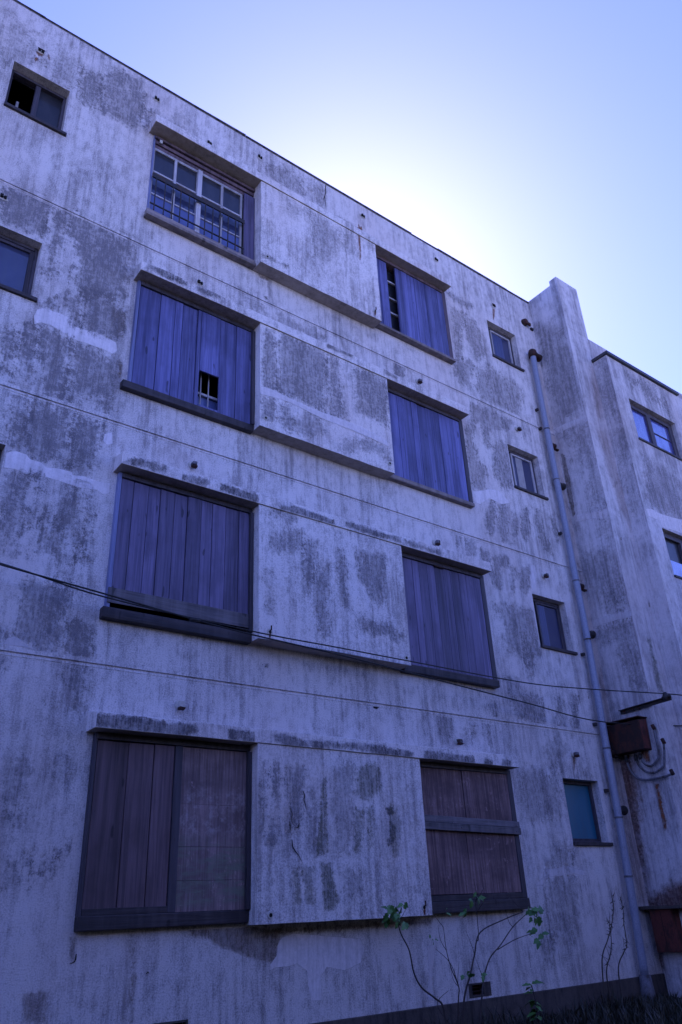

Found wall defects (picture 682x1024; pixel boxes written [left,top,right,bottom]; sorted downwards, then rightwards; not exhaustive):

water stain [79,68,152,128]
water stain [261,329,405,438]
water stain [485,500,558,550]
crack [289,791,306,862]
rust [655,784,667,830]
water stain [311,864,338,909]
water stain [189,918,431,960]